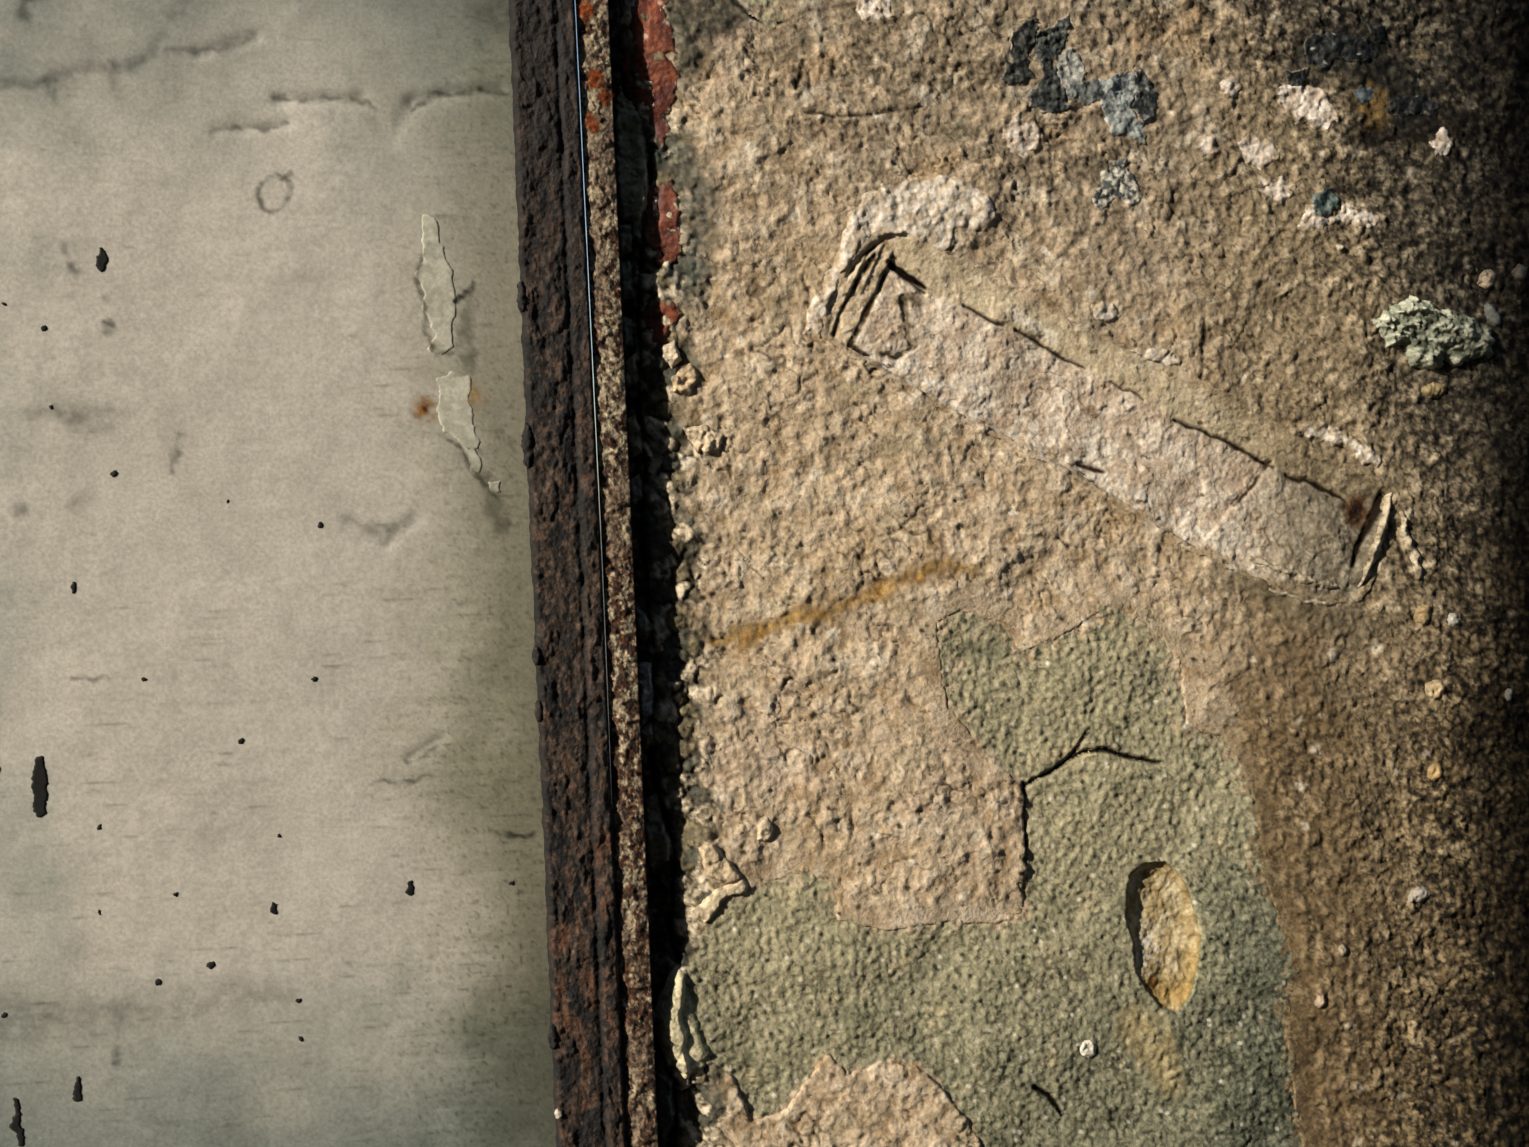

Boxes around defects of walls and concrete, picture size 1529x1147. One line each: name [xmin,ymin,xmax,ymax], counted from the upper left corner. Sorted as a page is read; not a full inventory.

peeling [618,0,681,152]
peeling [1000,15,1156,145]
damp [1278,20,1471,146]
peeling [414,214,507,525]
rust [516,281,527,312]
peeling [638,299,700,395]
crack [1199,318,1207,380]
rust [521,422,534,469]
rust [708,558,971,648]
rust [534,700,543,722]
crack [1021,727,1161,859]
flaking render [678,603,1307,1147]